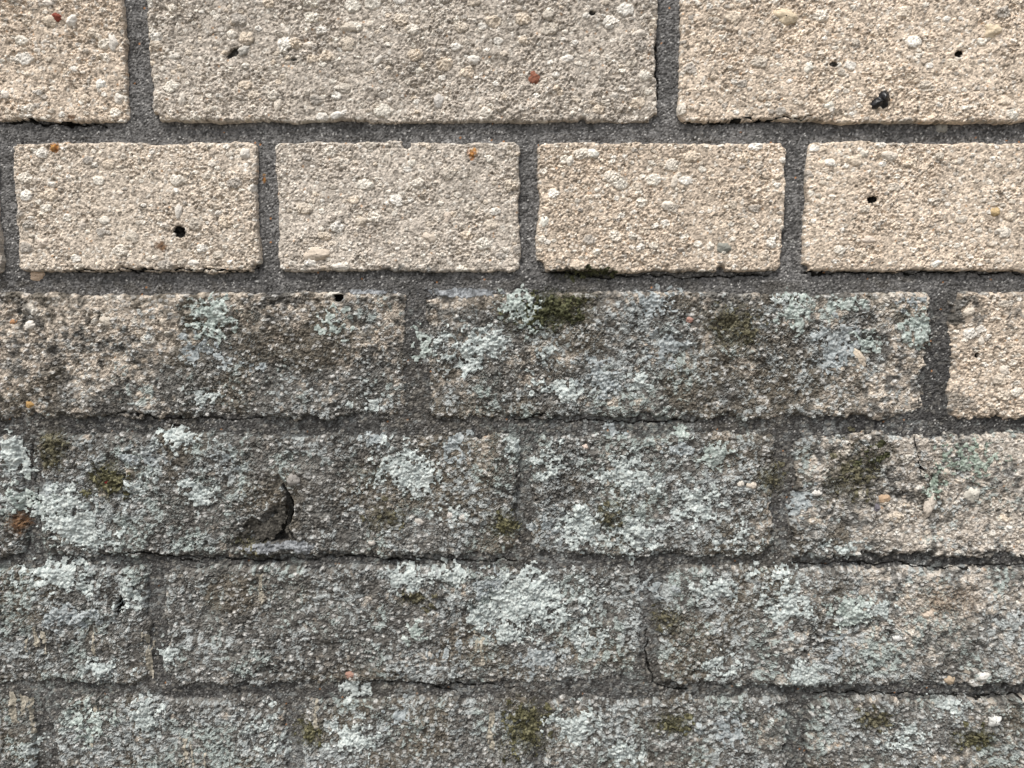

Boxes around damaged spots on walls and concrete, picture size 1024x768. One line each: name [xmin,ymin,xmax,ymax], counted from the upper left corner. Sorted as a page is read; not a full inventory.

spalling [231,487,315,555]
leakage [256,573,265,605]
leakage [24,626,48,655]
leakage [141,630,155,678]
leakage [473,630,486,667]
leakage [8,691,37,734]
leakage [486,710,495,752]